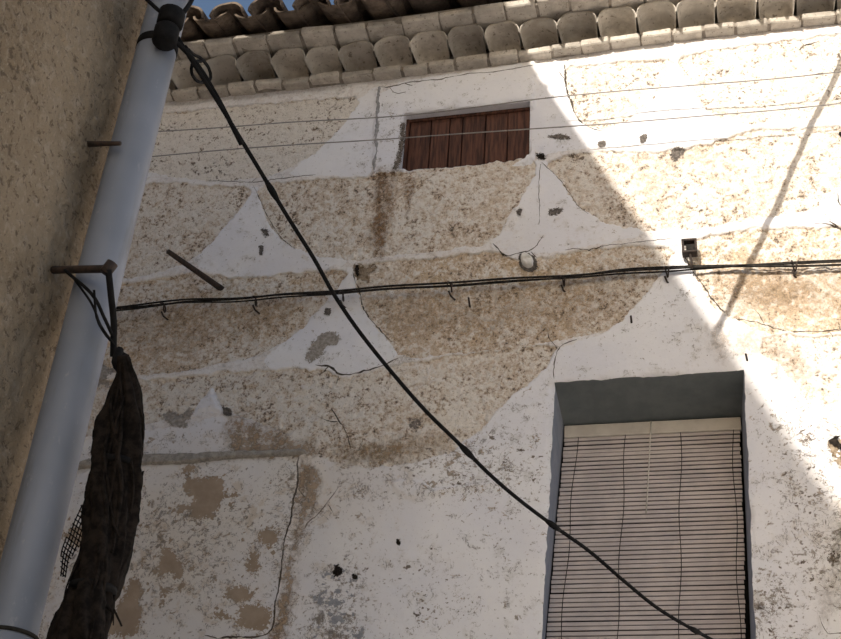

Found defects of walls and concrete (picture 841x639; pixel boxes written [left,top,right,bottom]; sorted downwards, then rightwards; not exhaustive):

peeling [86,34,841,477]
peeling [108,537,195,639]
peeling [134,463,242,540]
crack [205,457,338,639]
peeling [826,543,840,588]